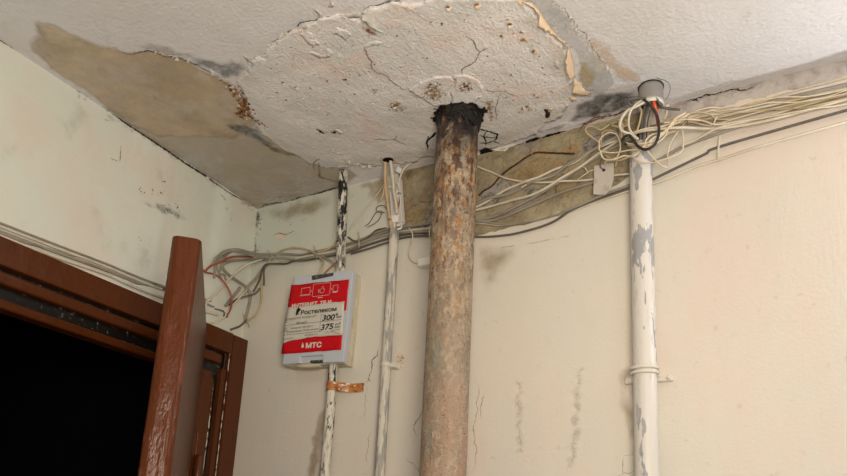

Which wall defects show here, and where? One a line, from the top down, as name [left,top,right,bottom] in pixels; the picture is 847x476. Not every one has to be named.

peeling [291,0,384,59]
crack [461,36,488,75]
spalling [500,19,544,69]
rust [219,79,268,129]
rust [416,77,473,100]
leakage [575,94,632,119]
crack [374,132,436,149]
spalling [475,112,642,236]
spalling [399,164,435,235]